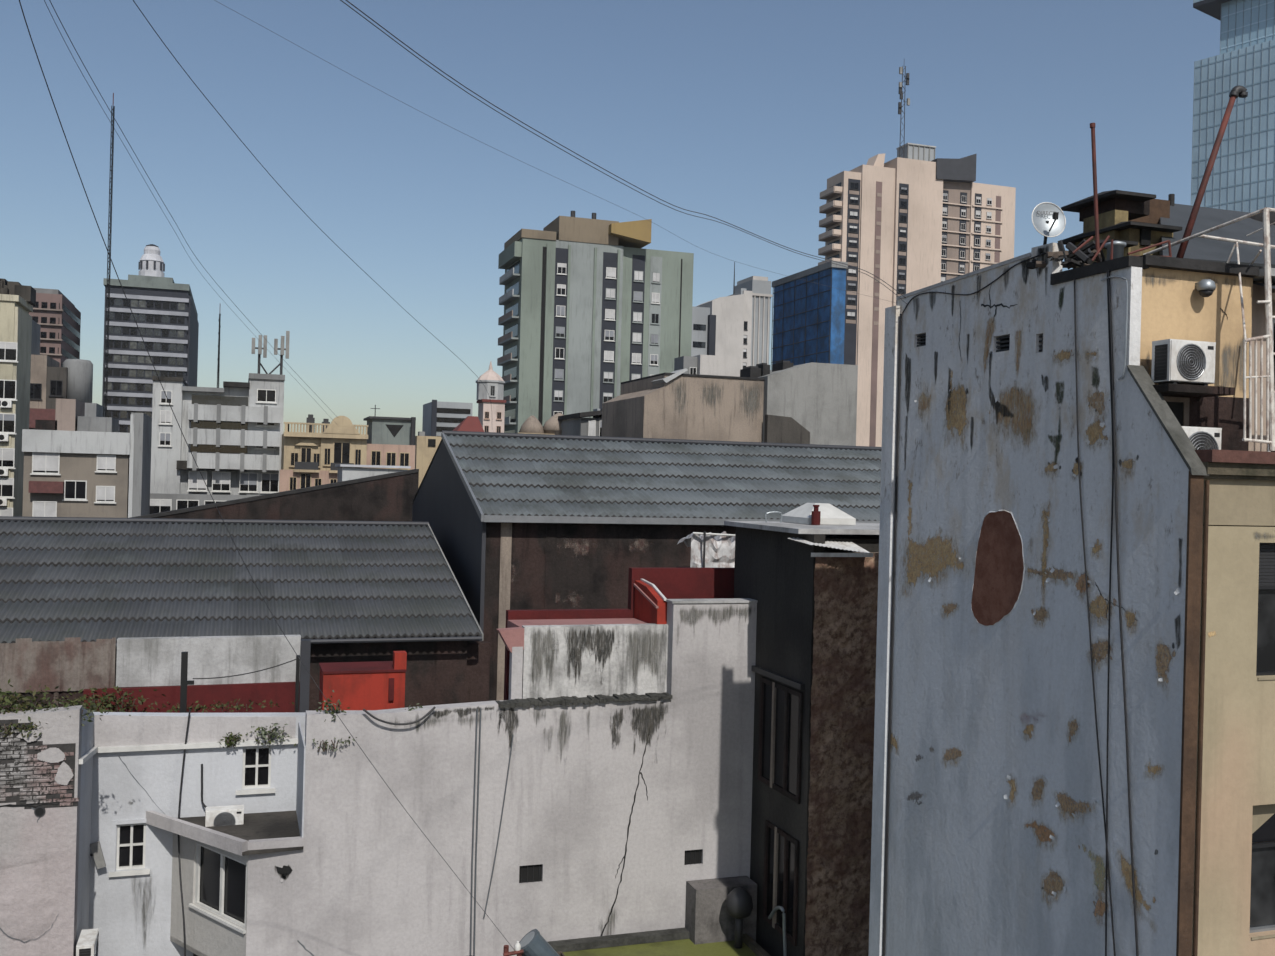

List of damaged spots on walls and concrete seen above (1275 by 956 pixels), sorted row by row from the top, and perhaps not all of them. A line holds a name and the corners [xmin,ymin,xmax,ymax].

peeling [944,371,968,443]
flaking render [903,480,1139,629]
spalling [1174,539,1182,595]
water stain [532,628,614,679]
water stain [628,631,661,676]
peeling [1155,614,1180,683]
water stain [559,712,570,754]
water stain [610,704,668,751]
flaking render [0,719,79,809]
peeling [1031,777,1047,800]
peeling [1055,792,1096,818]
peeling [1026,821,1055,846]